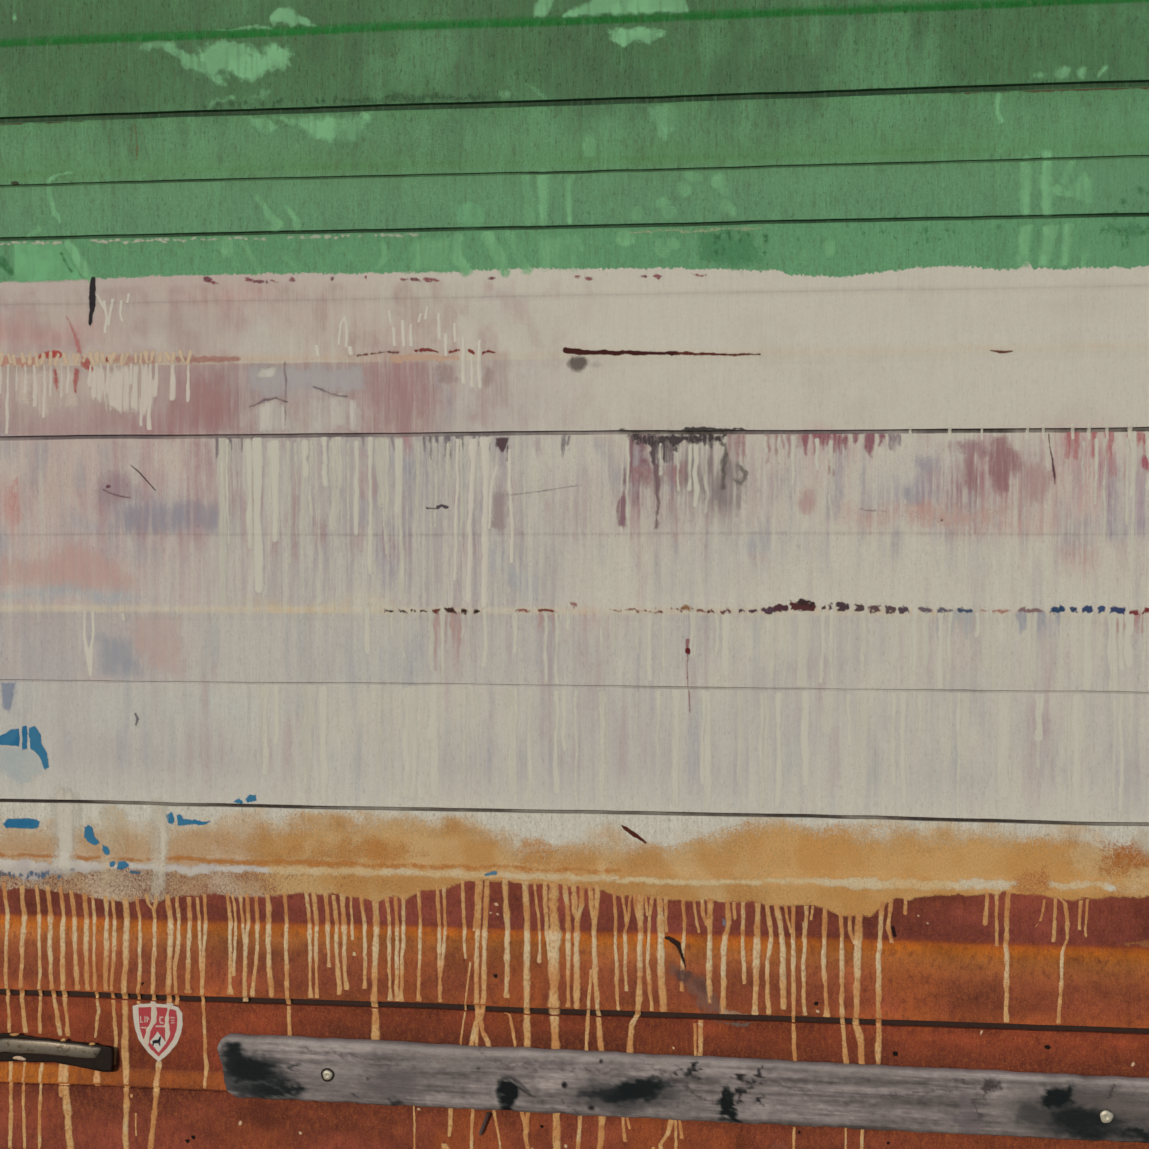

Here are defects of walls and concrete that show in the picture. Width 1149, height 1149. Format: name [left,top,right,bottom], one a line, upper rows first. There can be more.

leakage [0,349,193,434]
leakage [567,354,602,373]
leakage [616,424,912,530]
leakage [902,424,1057,533]
leakage [1064,423,1149,546]
leakage [215,306,515,803]
peeling [0,726,49,788]
leakage [758,606,869,808]
leakage [889,605,993,818]
leakage [1065,609,1148,821]
corrosion [0,832,622,877]
corrosion [1092,835,1149,881]